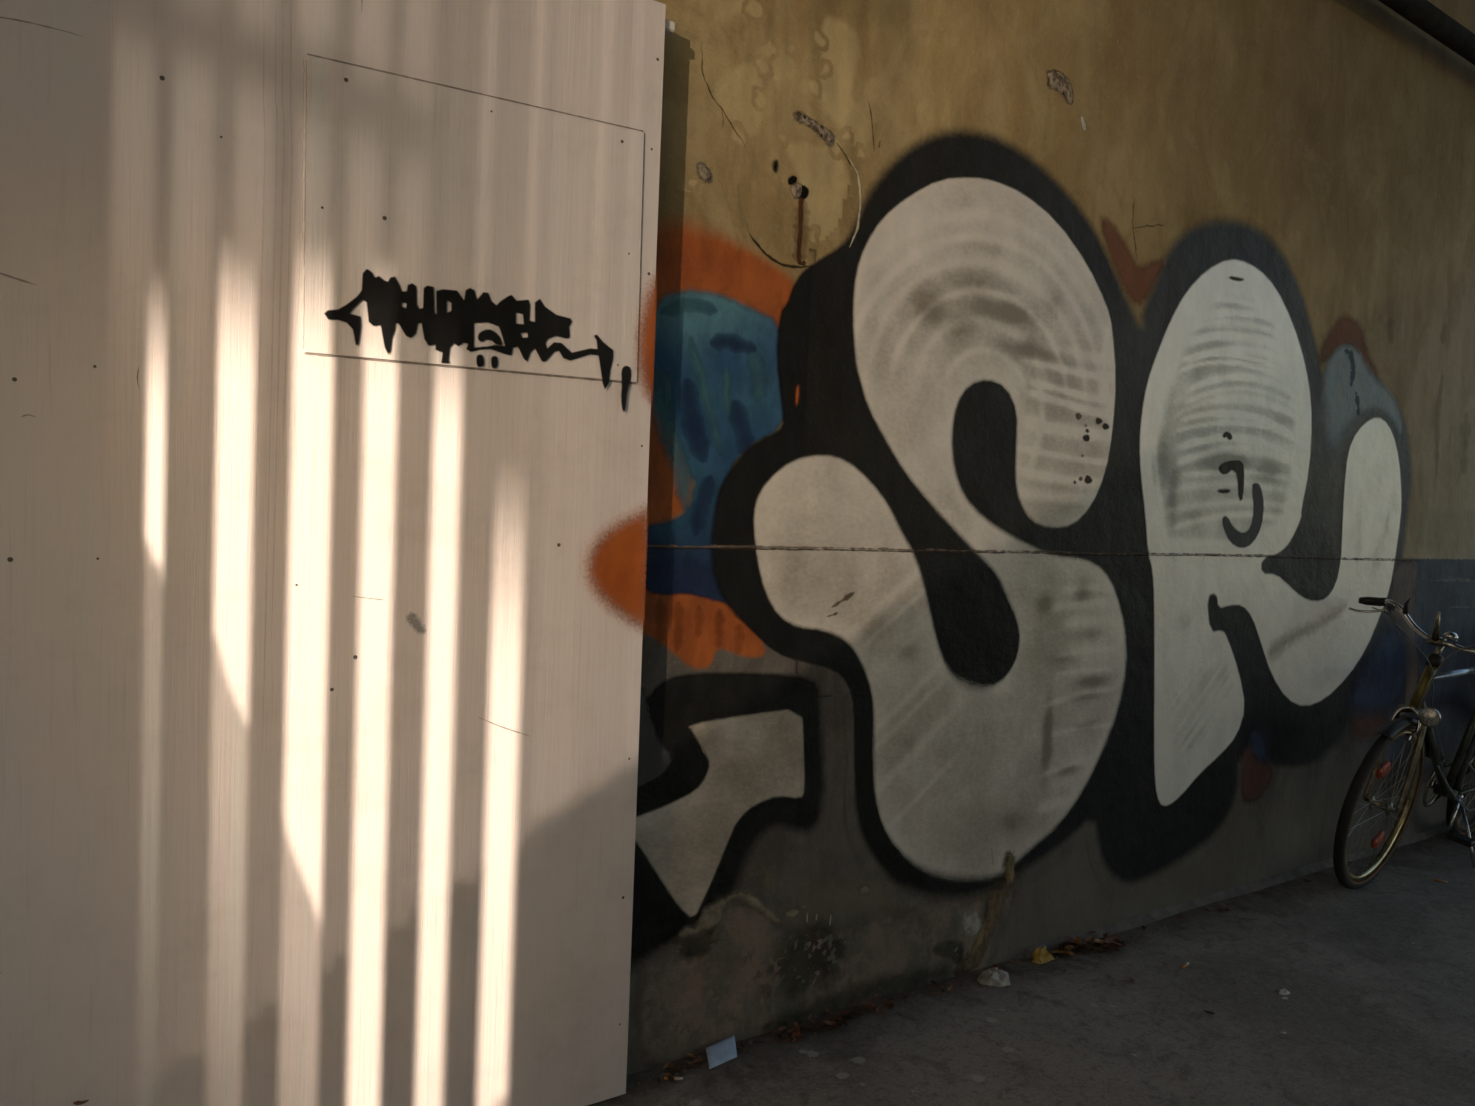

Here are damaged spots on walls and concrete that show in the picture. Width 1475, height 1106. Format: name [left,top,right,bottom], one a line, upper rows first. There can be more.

spalling [1047,70,1073,105]
corrosion [797,197,806,265]
crack [647,544,1419,562]